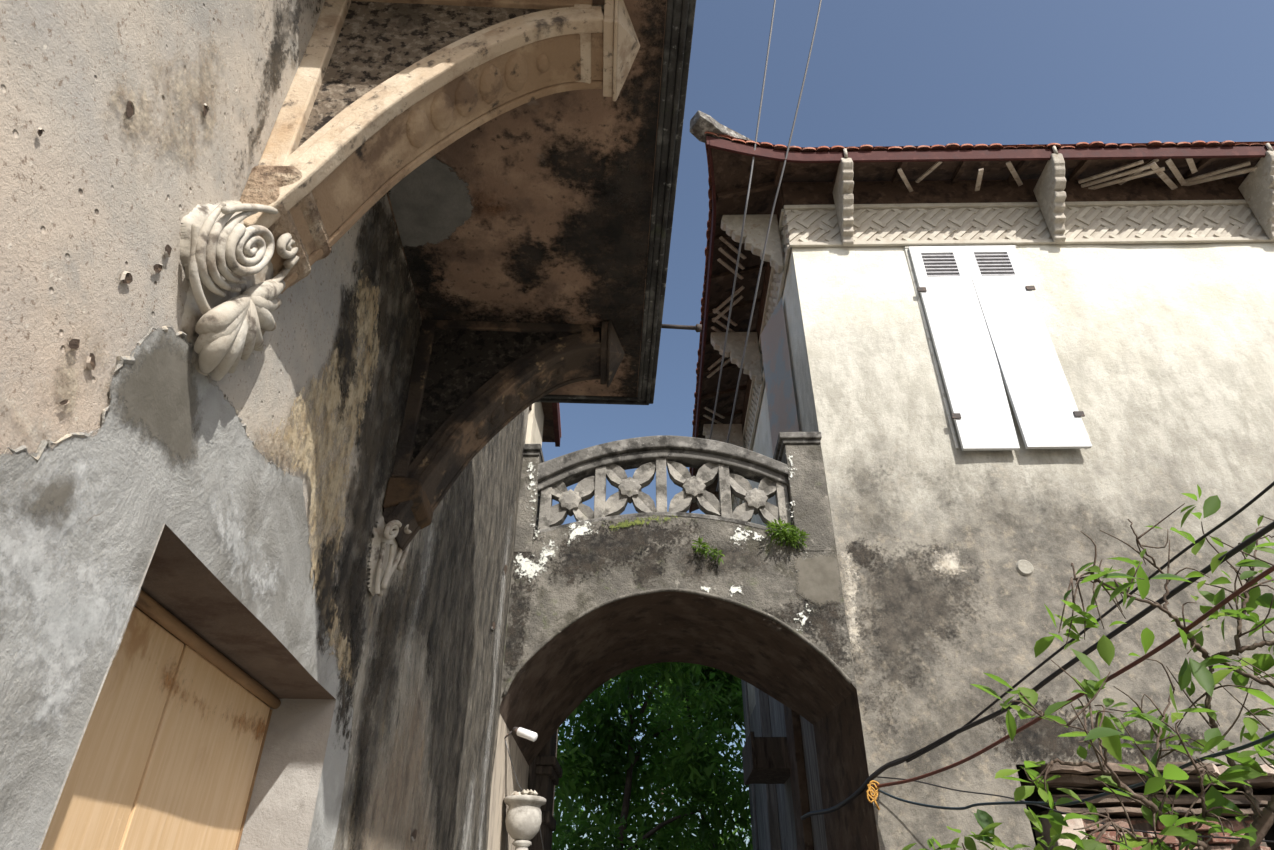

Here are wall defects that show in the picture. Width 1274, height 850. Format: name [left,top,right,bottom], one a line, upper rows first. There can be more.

leakage [237,0,321,176]
spalling [4,386,111,462]
peeling [207,270,380,693]
leakage [316,0,768,850]
leakage [763,543,987,742]